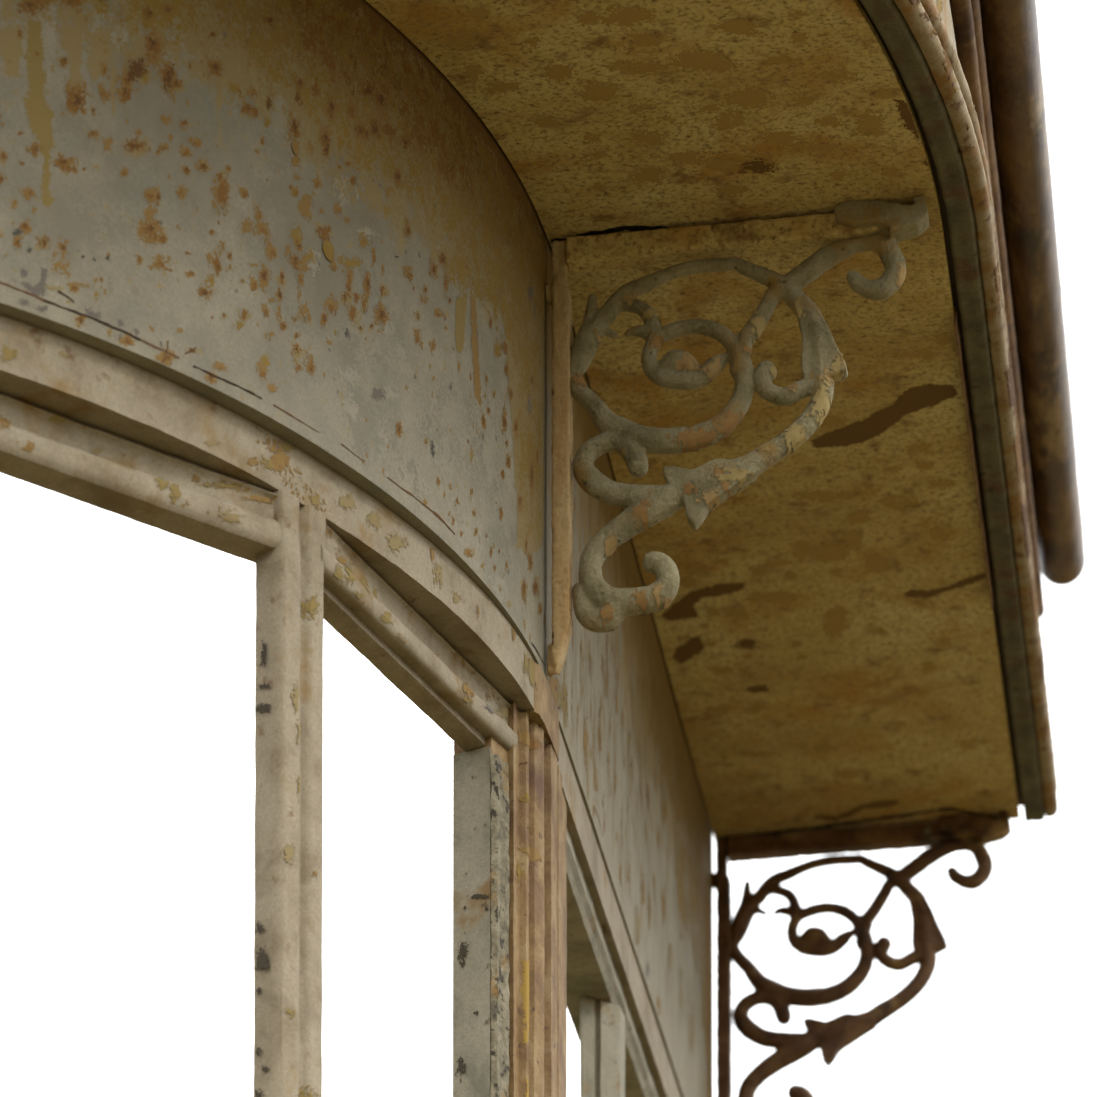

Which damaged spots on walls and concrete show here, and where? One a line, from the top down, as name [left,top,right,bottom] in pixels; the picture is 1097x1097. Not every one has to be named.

peeling [441,362,504,492]
rust [776,354,958,455]
rust [631,575,745,664]